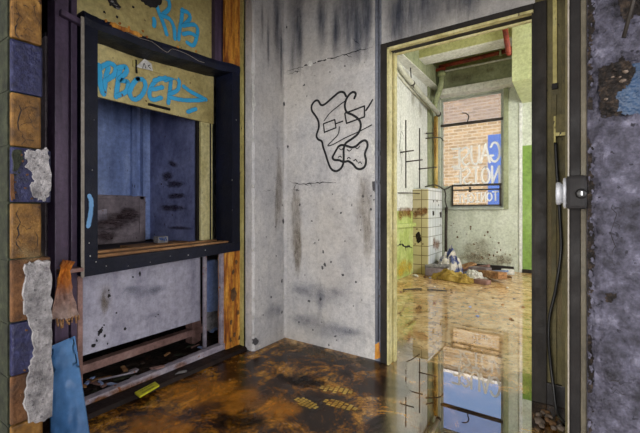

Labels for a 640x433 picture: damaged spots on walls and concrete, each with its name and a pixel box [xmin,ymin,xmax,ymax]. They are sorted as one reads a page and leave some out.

crack [288,40,371,74]
spalling [587,0,640,118]
flaking render [10,147,52,202]
flaking render [20,260,54,423]
damp [279,375,321,386]